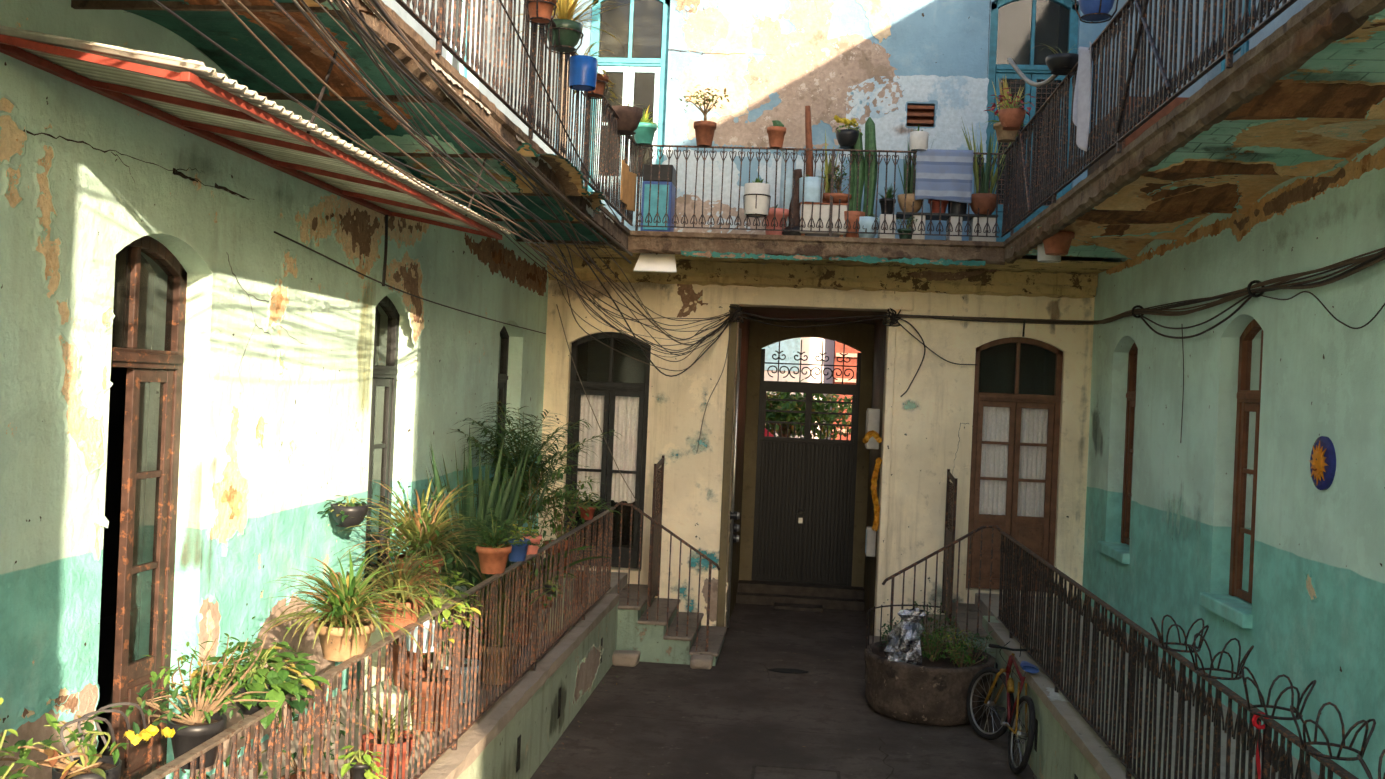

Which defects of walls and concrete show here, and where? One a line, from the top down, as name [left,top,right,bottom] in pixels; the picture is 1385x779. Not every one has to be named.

crack [24,129,255,200]
flaking render [181,0,614,223]
peeling [672,0,904,153]
flaking render [1061,79,1385,277]
peeling [0,111,113,481]
peeling [98,304,116,332]
peeling [266,192,430,346]
flaking render [463,232,548,298]
peeling [90,515,109,564]
peeling [207,402,269,557]